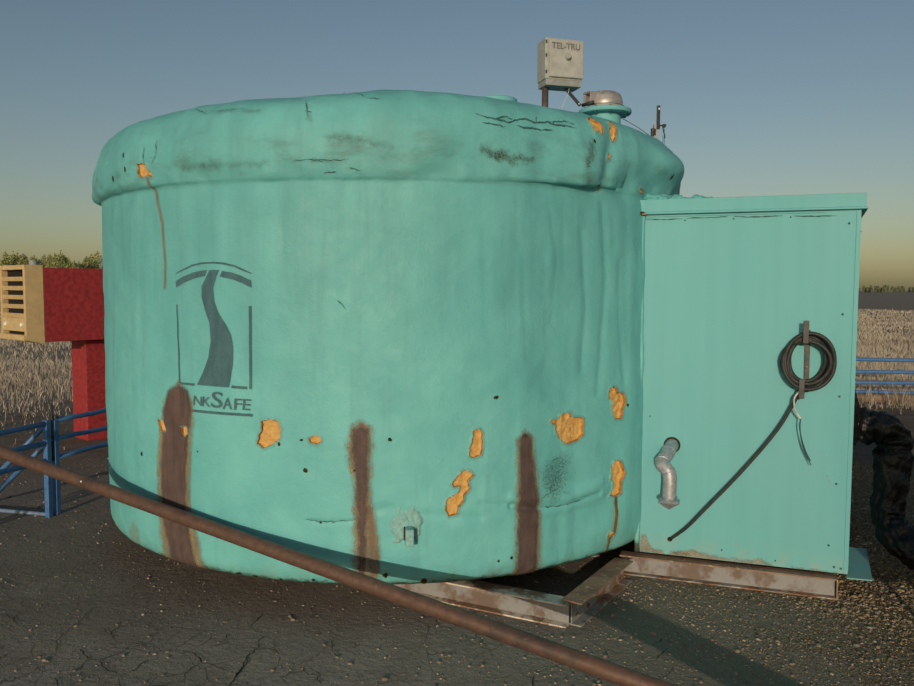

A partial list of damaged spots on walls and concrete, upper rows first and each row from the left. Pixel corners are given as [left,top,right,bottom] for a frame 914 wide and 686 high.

crack [476,113,576,130]
peeling [585,117,618,162]
corrosion [157,383,192,512]
peeling [256,417,283,450]
corrosion [347,423,379,578]
peeling [443,427,485,518]
corrosion [511,433,541,576]
peeling [548,410,585,446]
peeling [607,458,627,499]
peeling [607,384,629,421]
corrosion [160,518,206,569]
crack [55,609,278,686]